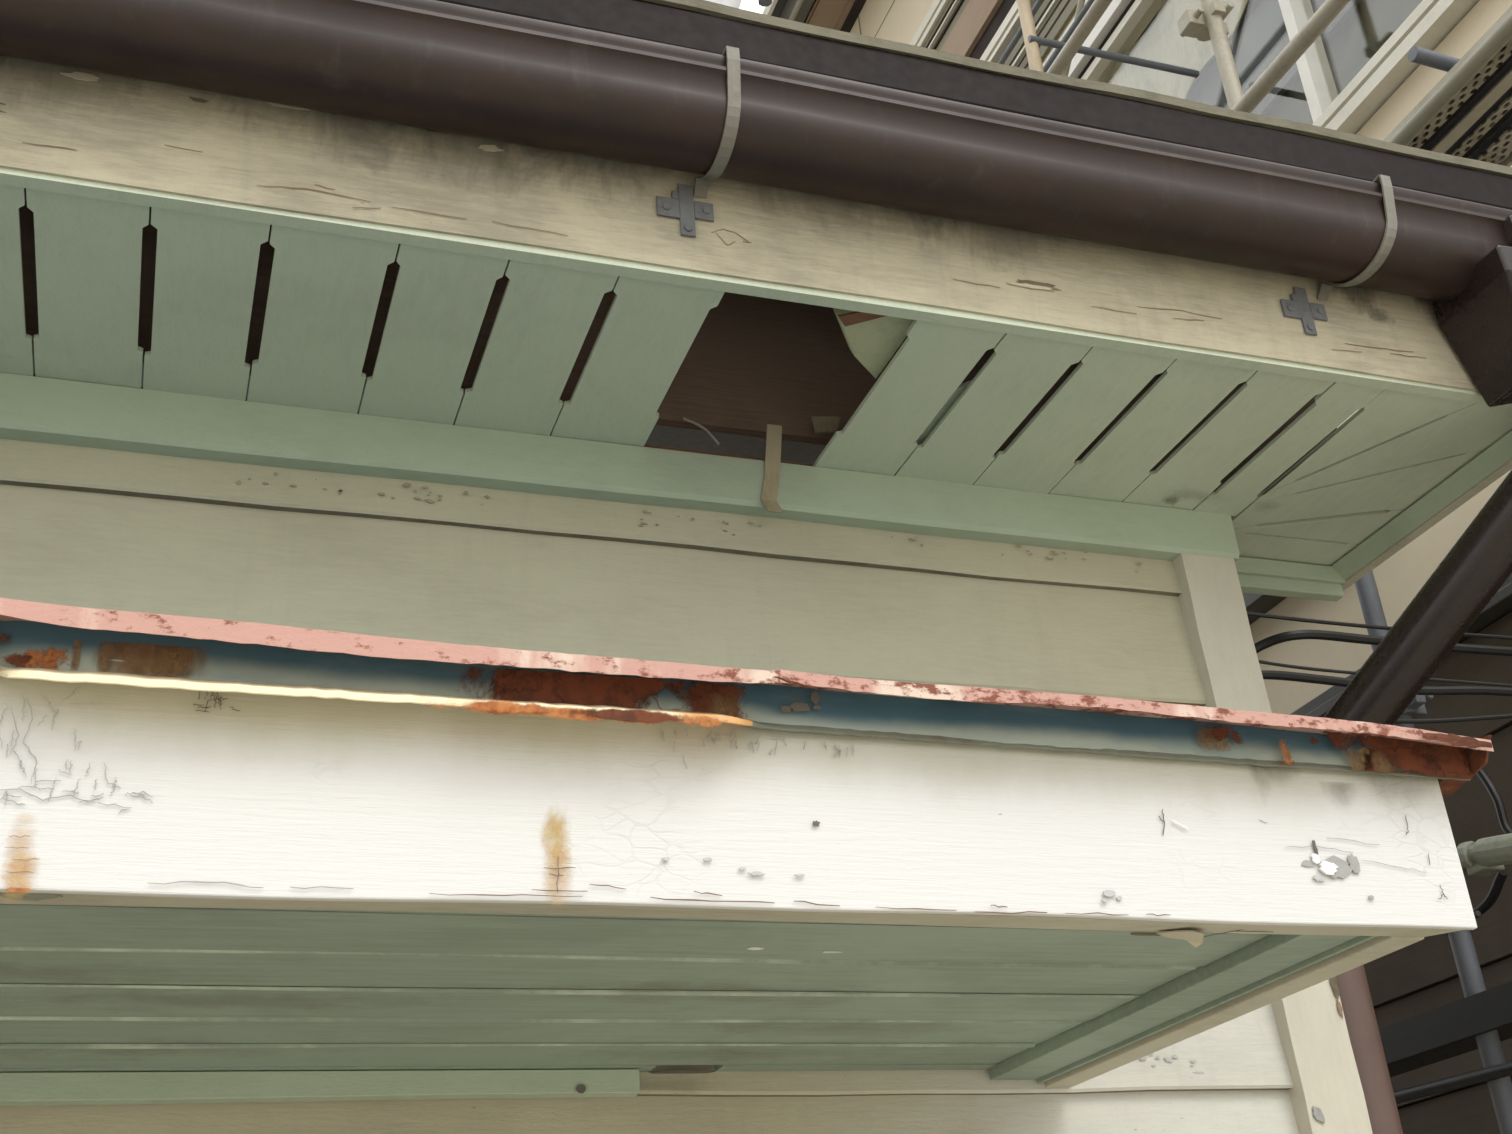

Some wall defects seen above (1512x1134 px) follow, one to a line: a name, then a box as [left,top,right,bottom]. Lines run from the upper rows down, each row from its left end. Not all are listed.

rust [0,633,81,670]
rust [98,642,197,677]
rust [440,667,745,727]
crack [0,686,153,814]
rust [1199,726,1241,750]
rust [1280,740,1294,765]
rust [1310,732,1492,779]
rust [6,835,37,892]
rust [532,823,587,893]